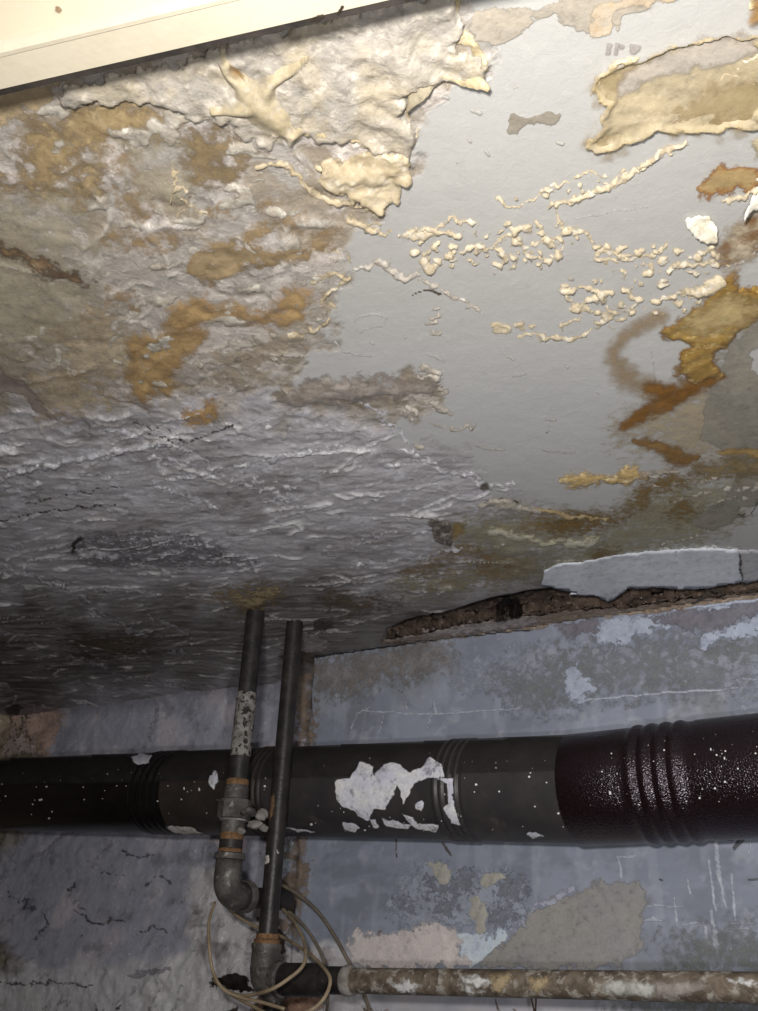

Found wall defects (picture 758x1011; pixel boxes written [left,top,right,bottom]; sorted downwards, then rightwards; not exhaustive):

peeling [0,0,758,347]
rust [697,163,758,201]
peeling [143,334,174,358]
flaking render [278,363,475,432]
rust [522,211,758,539]
damp [318,323,758,619]
flaking render [427,517,465,546]
damp [311,639,459,703]
peeling [381,545,758,714]
flaking render [343,854,650,970]